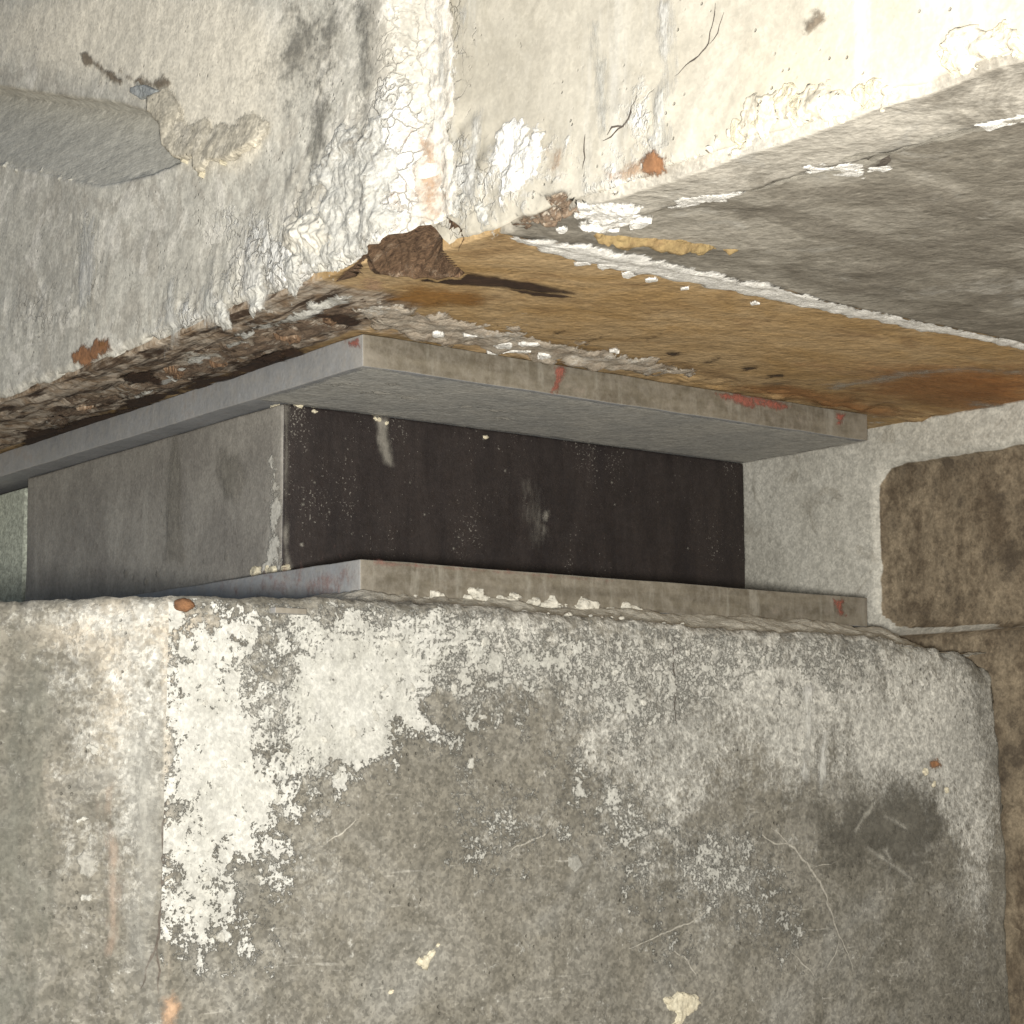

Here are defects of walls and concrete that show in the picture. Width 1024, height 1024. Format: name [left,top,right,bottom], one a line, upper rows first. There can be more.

crack [674,10,724,77]
spalling [0,81,269,185]
water stain [422,118,546,235]
rust [625,150,667,177]
water stain [421,274,573,298]
rust [72,338,111,368]
water stain [20,348,303,445]
water stain [312,302,696,378]
water stain [262,368,858,463]
peeling [160,598,905,998]
peeling [816,768,949,879]